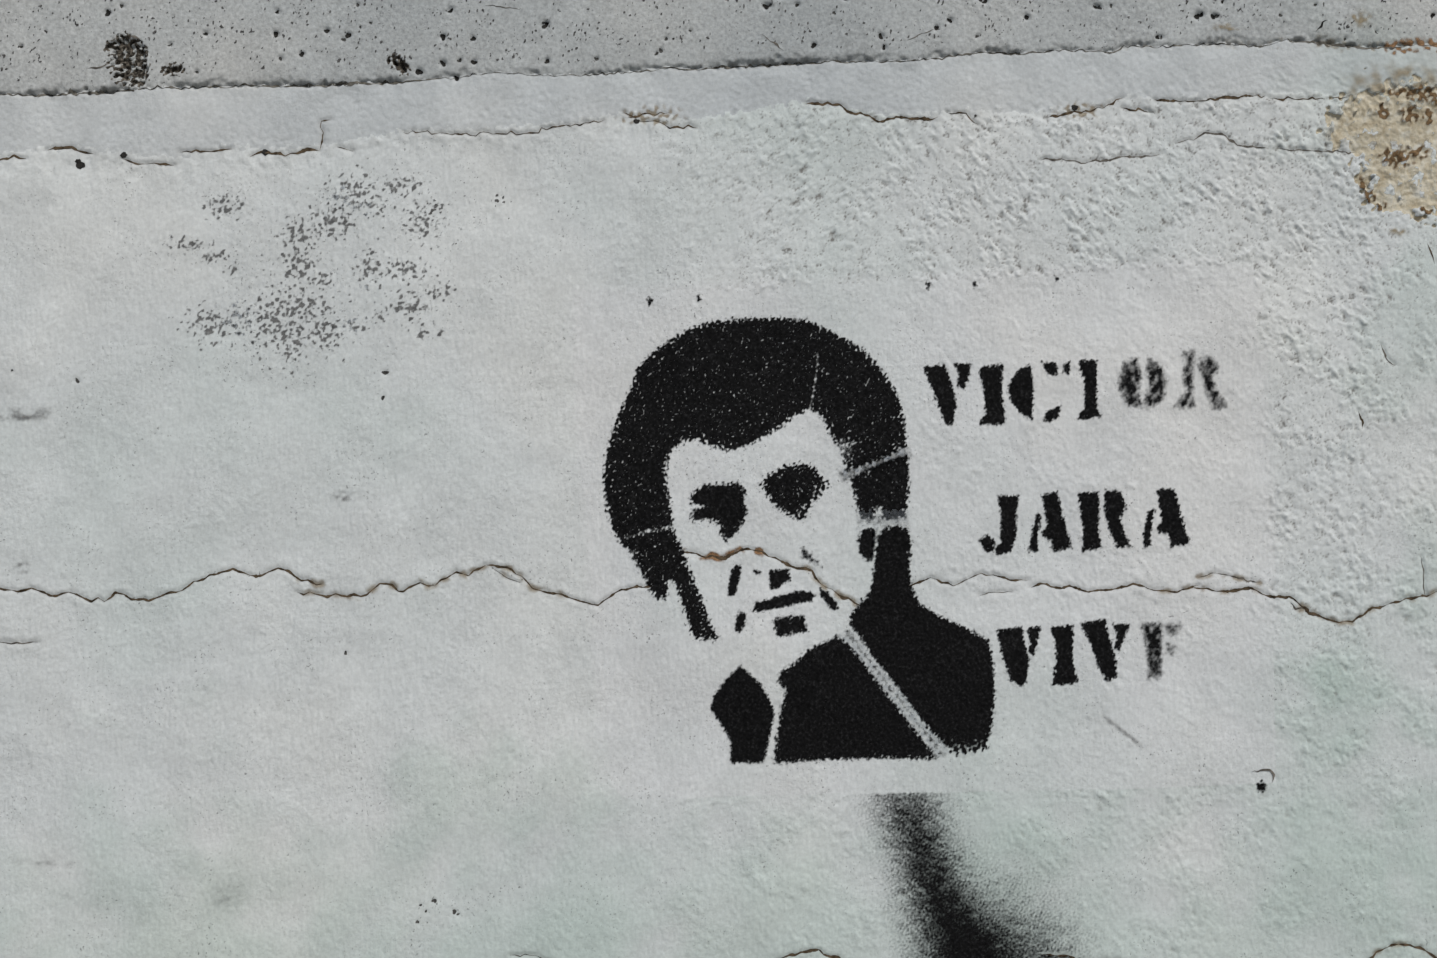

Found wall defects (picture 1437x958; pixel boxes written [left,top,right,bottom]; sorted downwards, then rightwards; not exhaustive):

crack [0,20,1437,169]
peeling [1316,68,1437,228]
crack [0,564,653,606]
crack [684,547,859,605]
crack [909,560,1437,623]
crack [782,949,841,958]
crack [1370,943,1437,958]